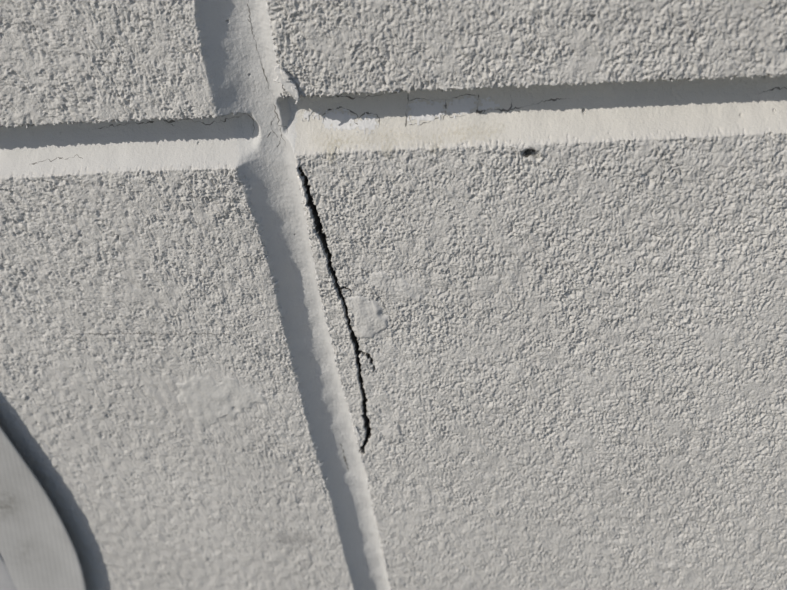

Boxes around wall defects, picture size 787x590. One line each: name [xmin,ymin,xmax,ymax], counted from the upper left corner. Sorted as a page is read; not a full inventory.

peeling [273,65,300,104]
crack [298,167,375,471]